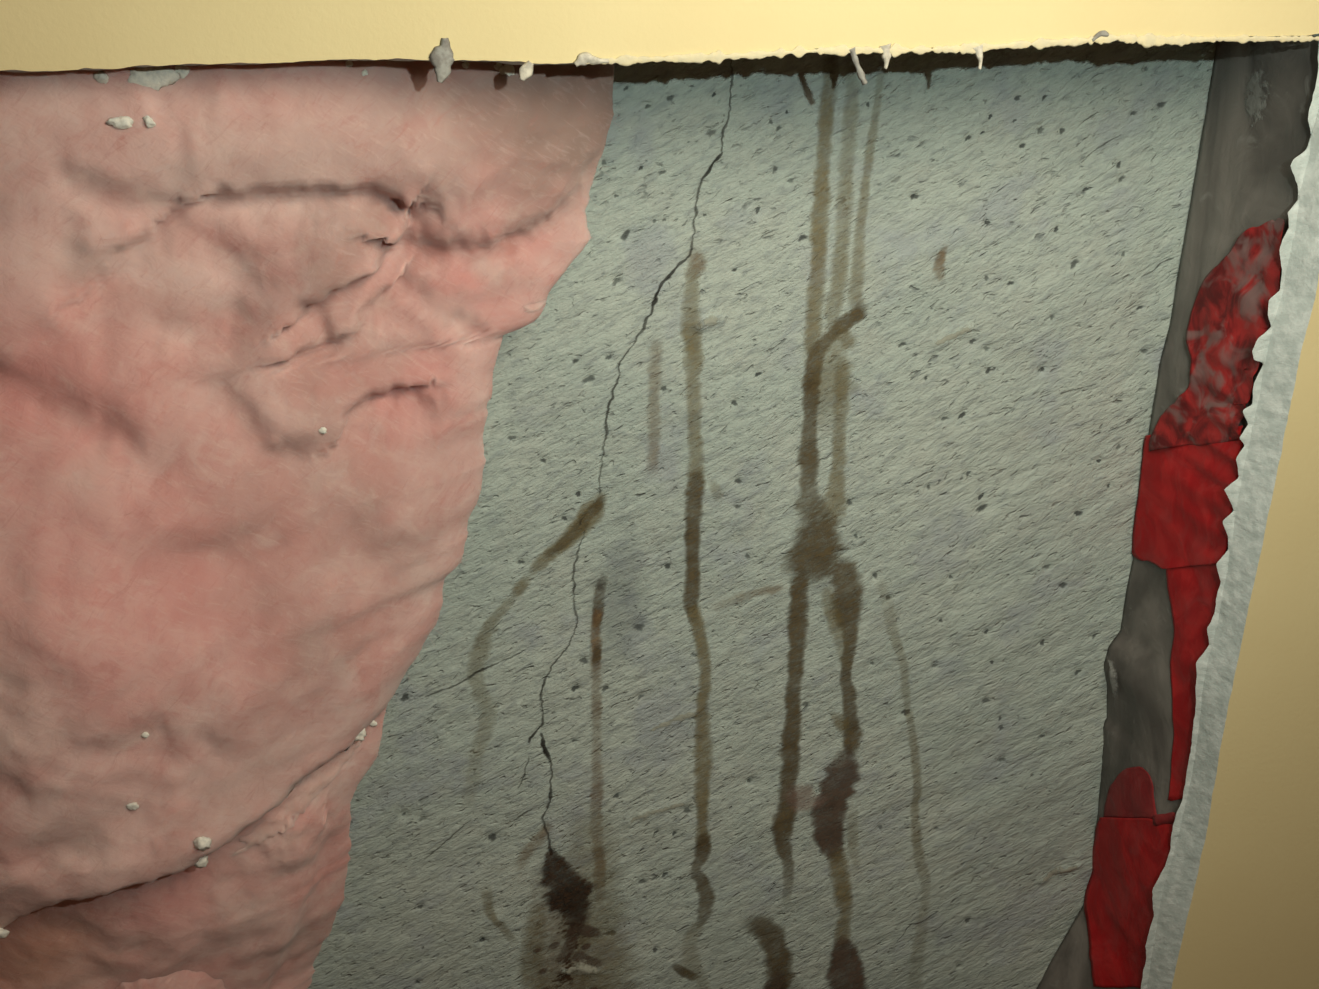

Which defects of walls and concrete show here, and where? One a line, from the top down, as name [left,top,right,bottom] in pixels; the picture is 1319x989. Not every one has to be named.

crack [605,126,726,438]
leakage [684,323,700,370]
leakage [539,499,603,562]
leakage [773,96,866,989]
crack [528,562,578,851]
leakage [684,471,714,918]
leakage [534,849,599,989]
leakage [675,965,696,979]
leakage [751,919,794,989]